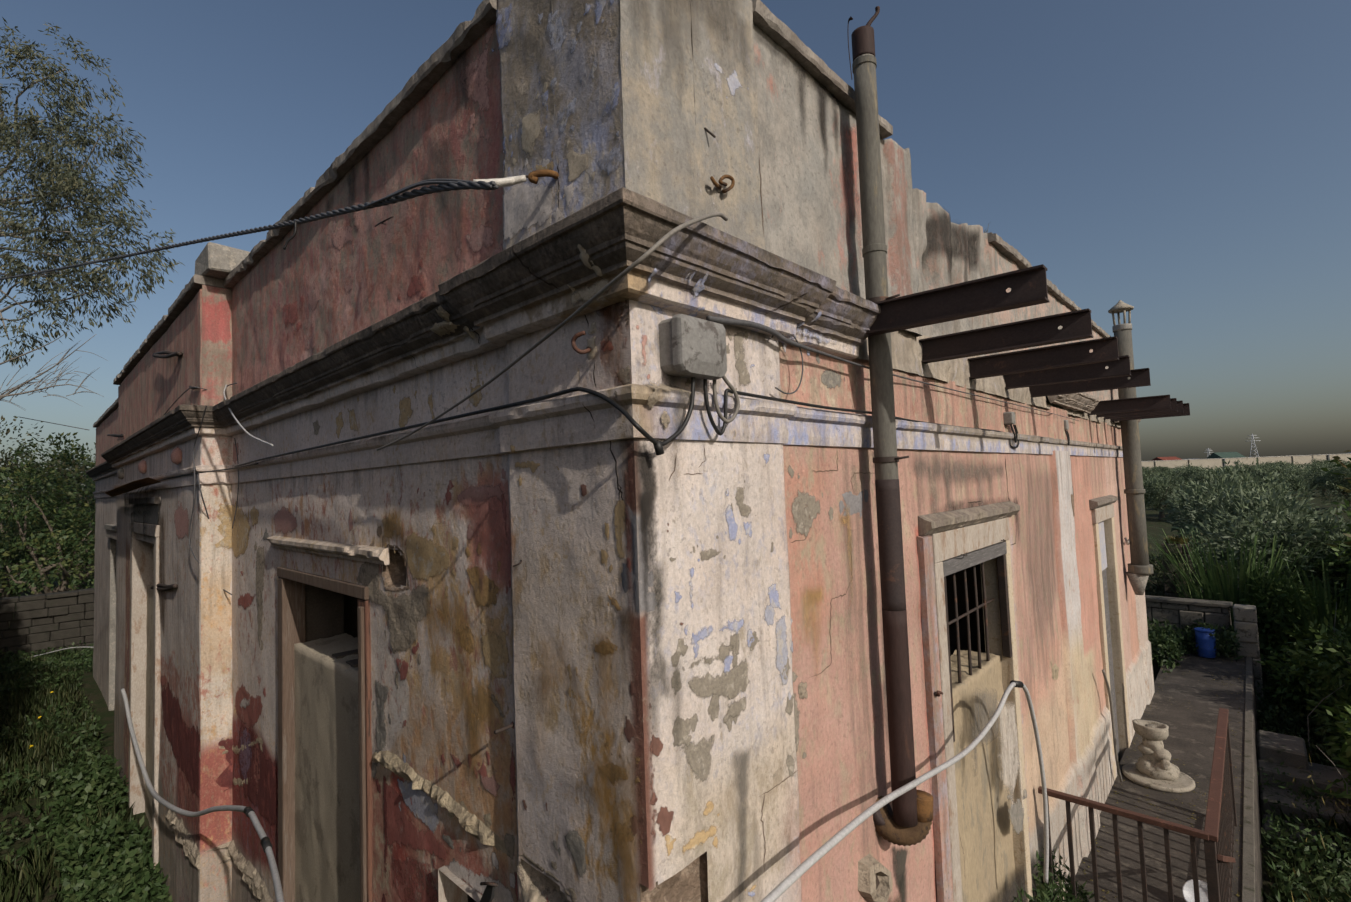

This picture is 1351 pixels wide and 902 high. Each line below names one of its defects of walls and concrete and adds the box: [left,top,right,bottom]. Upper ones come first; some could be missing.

peeling [538,0,614,60]
peeling [456,4,595,272]
damp [926,214,979,282]
peeling [173,495,304,650]
peeling [601,500,658,613]
damp [622,449,656,583]
peeling [670,480,752,609]
spalling [788,465,845,538]
peeling [160,676,201,800]
peeling [216,685,278,837]
peeling [357,515,587,902]
spalling [598,584,808,902]